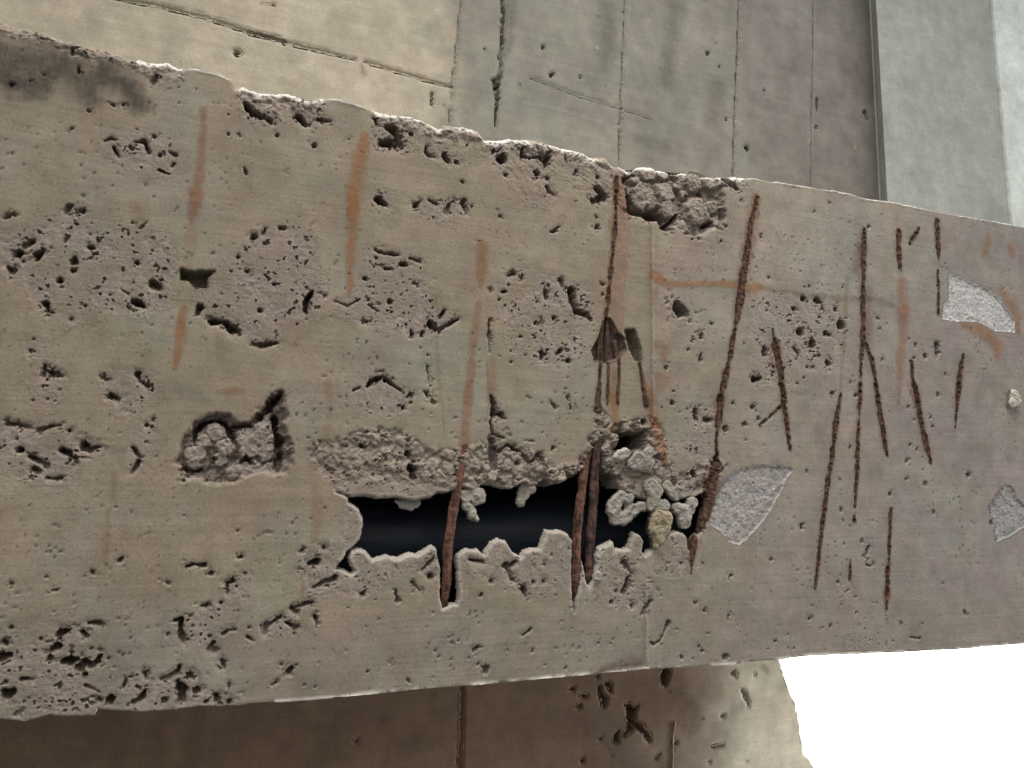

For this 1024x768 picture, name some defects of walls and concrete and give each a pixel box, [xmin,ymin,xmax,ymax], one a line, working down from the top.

spalling [231,82,327,133]
spalling [717,177,749,194]
spalling [178,455,219,482]
spalling [191,390,286,473]
spalling [262,401,795,635]
corrosion [571,433,603,602]
corrosion [594,175,621,428]
corrosion [650,194,762,574]
corrosion [814,392,843,591]
corrosion [853,228,889,523]
corrosion [898,357,933,464]
spalling [941,274,1015,333]